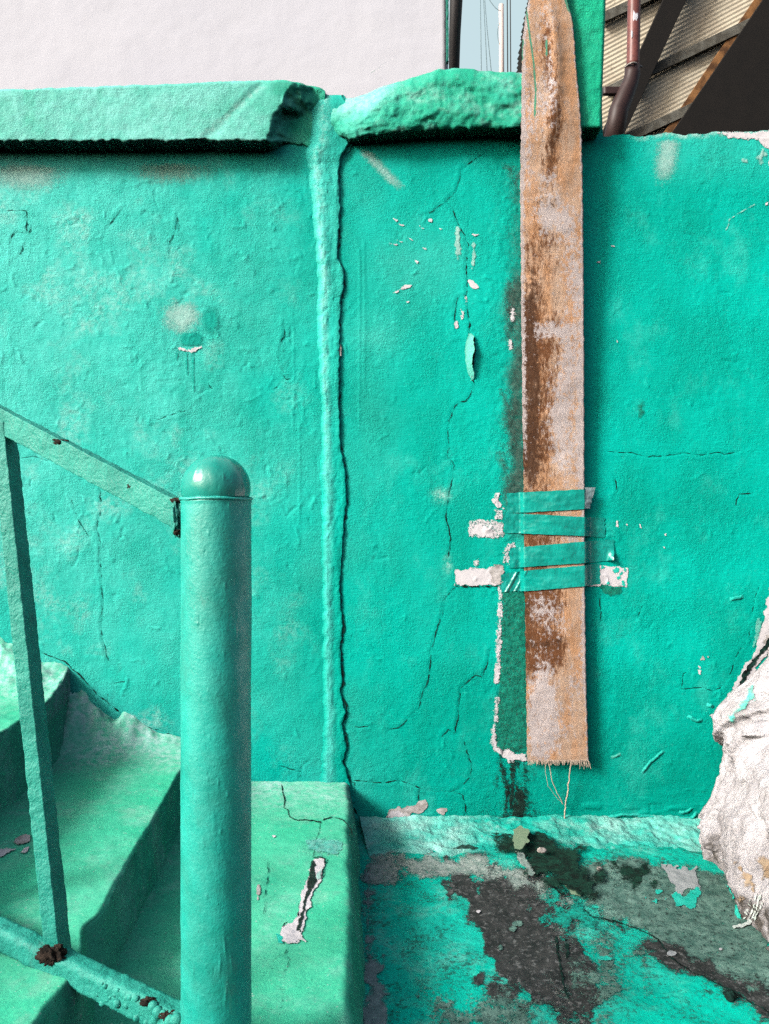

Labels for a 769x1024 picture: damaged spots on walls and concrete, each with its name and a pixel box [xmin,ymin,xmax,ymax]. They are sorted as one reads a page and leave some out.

crack [423,155,480,334]
peeling [454,226,479,265]
peeling [454,280,479,380]
crack [445,380,474,556]
crack [609,450,734,458]
peeling [590,565,628,587]
crack [281,561,489,855]
leakage [482,591,544,818]
peeling [386,800,447,818]
spalling [275,856,326,944]
leakage [360,869,389,1024]